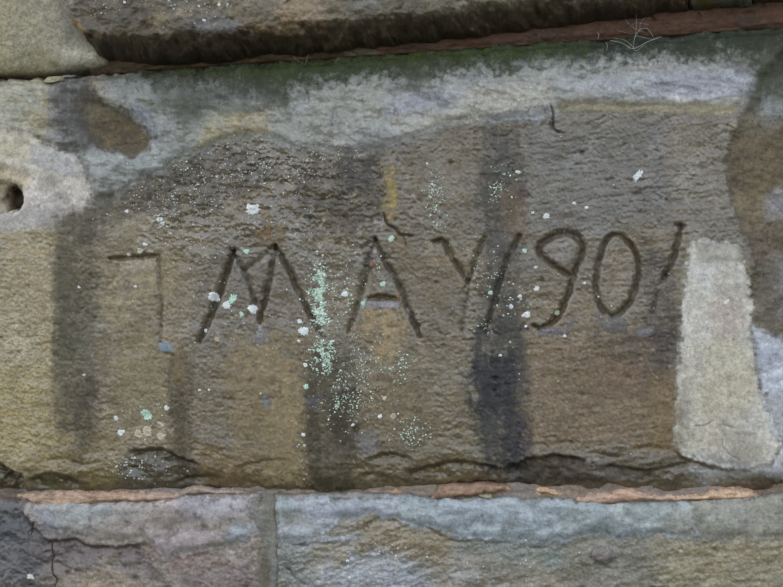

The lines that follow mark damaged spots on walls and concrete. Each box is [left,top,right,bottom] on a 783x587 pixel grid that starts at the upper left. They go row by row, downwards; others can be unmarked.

damp [469,130,531,478]